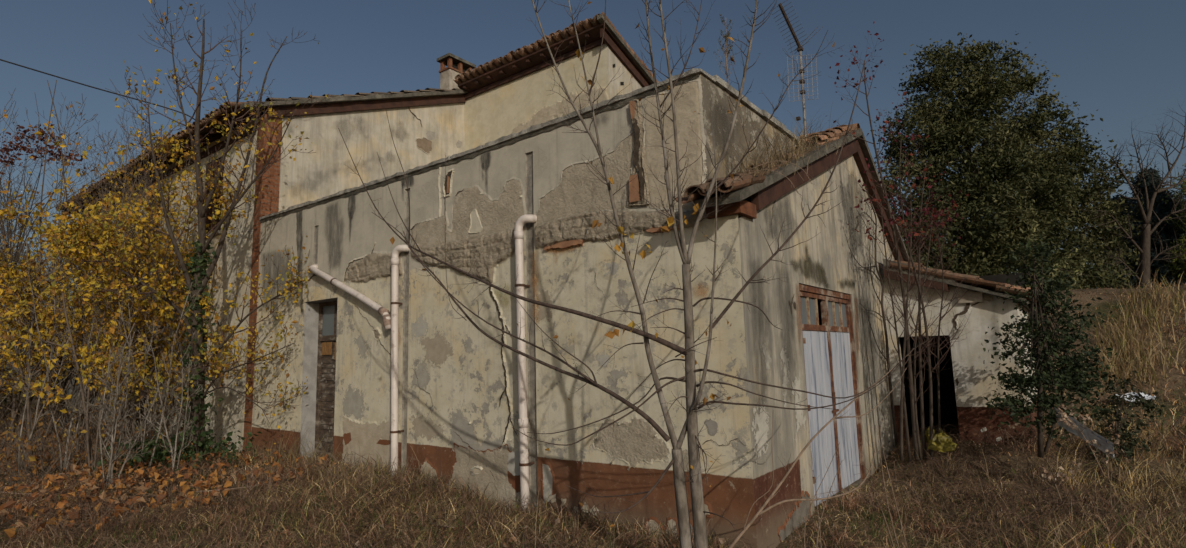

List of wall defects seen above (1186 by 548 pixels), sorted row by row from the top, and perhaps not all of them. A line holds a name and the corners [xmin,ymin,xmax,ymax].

flaking render [344,78,707,284]
damp [792,247,855,287]
peeling [411,314,476,390]
peeling [319,384,521,510]
peeling [577,414,689,471]